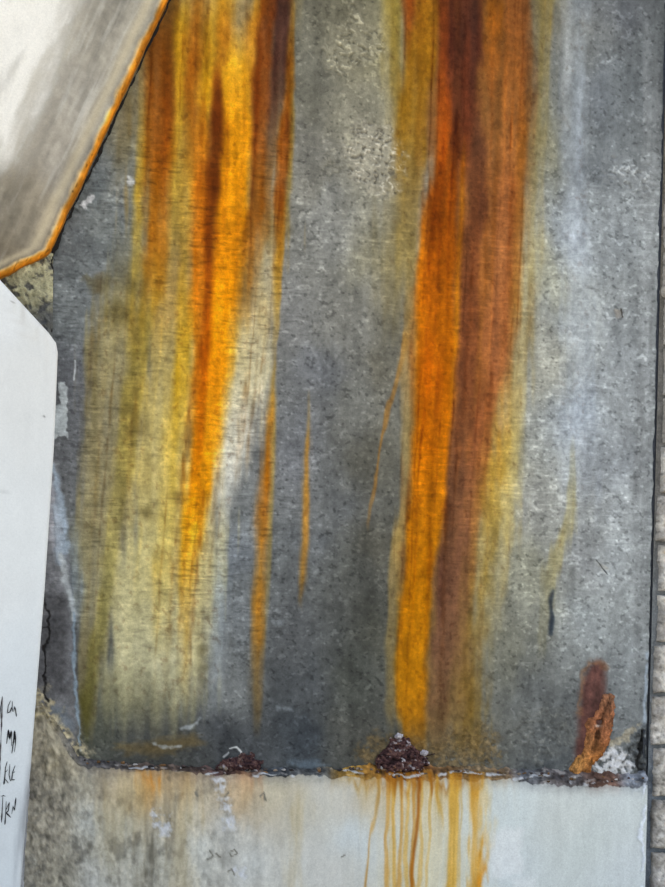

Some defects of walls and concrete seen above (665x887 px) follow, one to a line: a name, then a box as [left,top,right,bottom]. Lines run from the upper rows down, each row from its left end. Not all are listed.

crack [50,0,171,285]
corrosion [0,0,306,887]
corrosion [297,388,313,611]
corrosion [366,0,561,746]
crack [42,595,51,703]
corrosion [571,655,611,765]
corrosion [347,770,500,887]